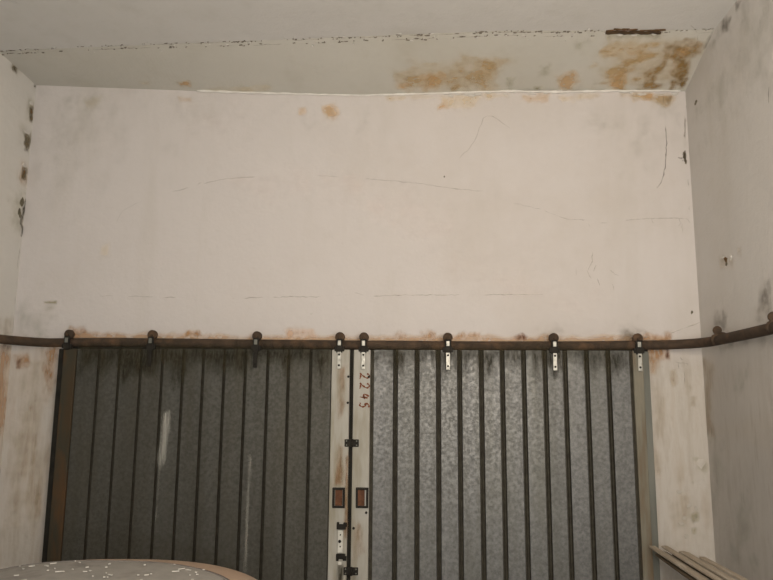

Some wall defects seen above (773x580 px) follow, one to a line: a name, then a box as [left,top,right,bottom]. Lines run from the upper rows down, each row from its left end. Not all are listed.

spalling [603,28,666,36]
water stain [635,44,699,105]